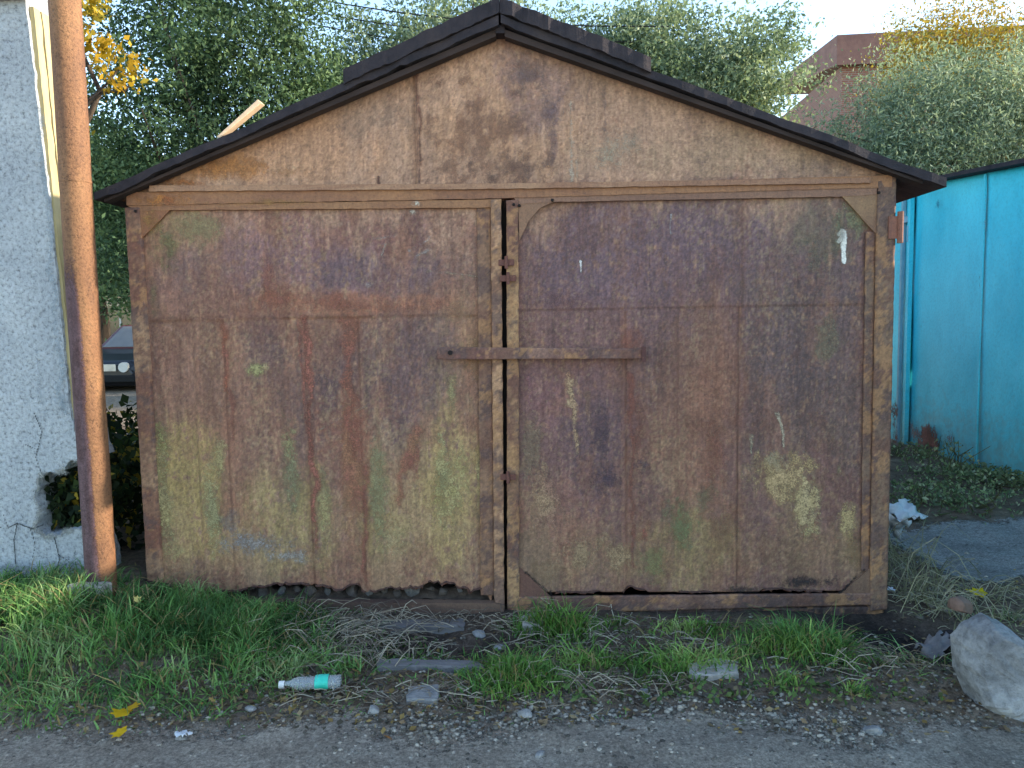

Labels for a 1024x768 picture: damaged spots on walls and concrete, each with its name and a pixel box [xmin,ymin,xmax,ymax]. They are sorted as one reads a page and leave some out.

rust [565,372,579,453]
rust [891,402,952,455]
crack [0,515,67,565]